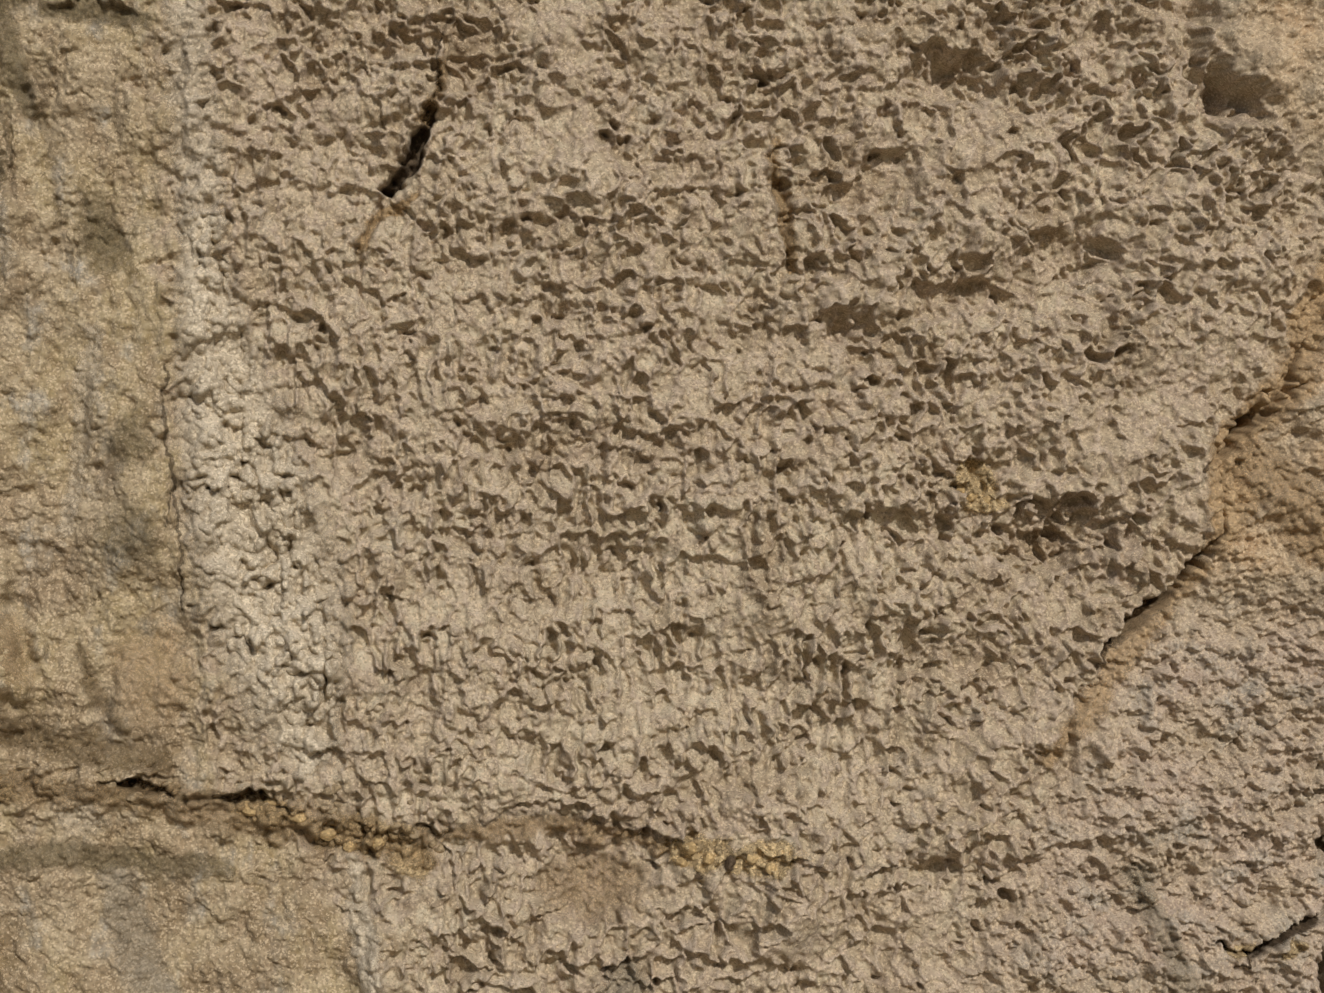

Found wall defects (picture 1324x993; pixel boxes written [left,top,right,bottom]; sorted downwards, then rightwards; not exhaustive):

crack [381,69,441,198]
crack [1098,635,1120,664]
crack [97,778,175,799]
crack [211,787,279,804]
crack [1213,914,1319,970]